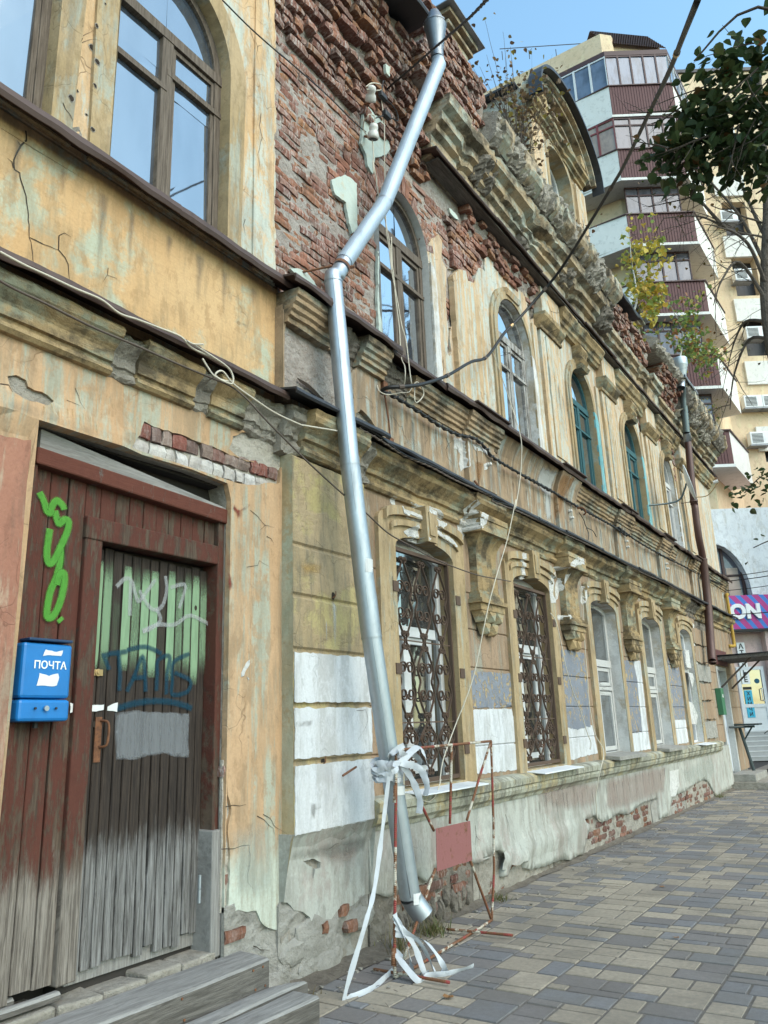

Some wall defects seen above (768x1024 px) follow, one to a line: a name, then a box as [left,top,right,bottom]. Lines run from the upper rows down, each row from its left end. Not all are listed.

crack [10,130,71,279]
flaking render [274,31,393,292]
flaking render [342,234,377,328]
flaking render [398,170,483,329]
flaking render [8,376,52,405]
flaking render [132,423,280,485]
flaking render [217,760,567,988]
flaking render [584,769,728,853]